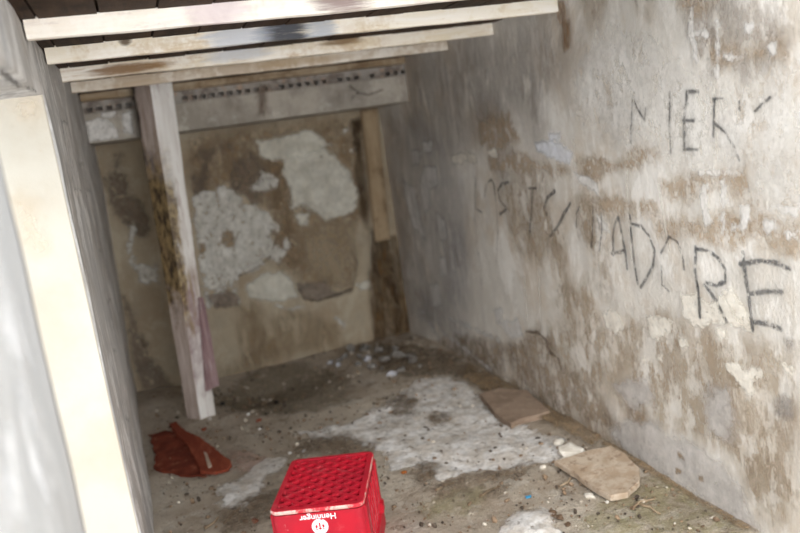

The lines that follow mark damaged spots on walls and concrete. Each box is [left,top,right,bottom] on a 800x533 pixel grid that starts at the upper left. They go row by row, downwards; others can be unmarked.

peeling [253,130,358,225]
peeling [193,185,372,312]
peeling [439,316,757,531]
peeling [603,309,624,333]
damp [552,323,740,448]
peeling [726,362,763,395]